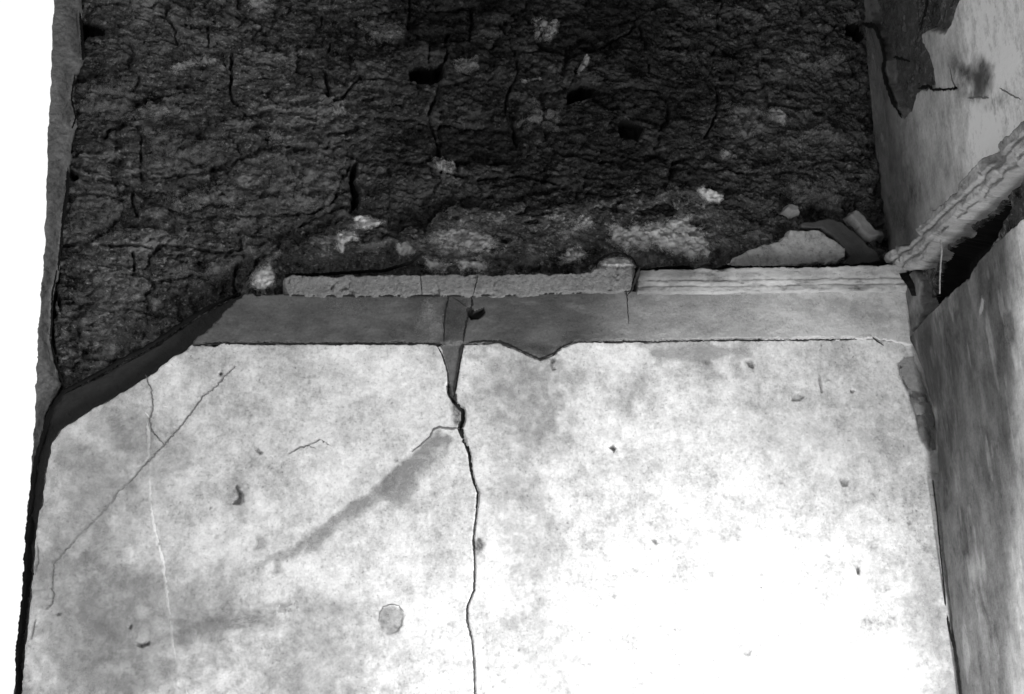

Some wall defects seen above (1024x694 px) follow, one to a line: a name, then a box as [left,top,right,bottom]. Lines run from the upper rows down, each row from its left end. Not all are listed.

crack [71,11,84,128]
spalling [879,0,960,112]
flaking render [53,0,889,393]
crack [15,168,916,694]
leakage [307,433,452,549]